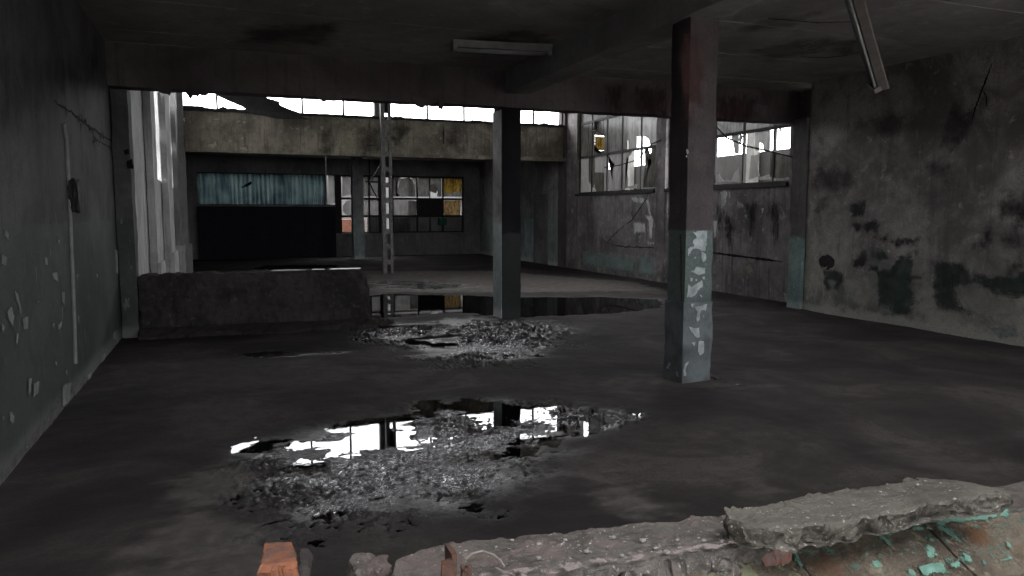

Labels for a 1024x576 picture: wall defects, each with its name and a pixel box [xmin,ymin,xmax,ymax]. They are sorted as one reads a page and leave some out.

water stain [713,190,734,252]
water stain [851,200,917,253]
peeling [2,291,28,343]
peeling [666,230,707,377]
spalling [25,362,92,450]
peeling [710,508,1024,576]